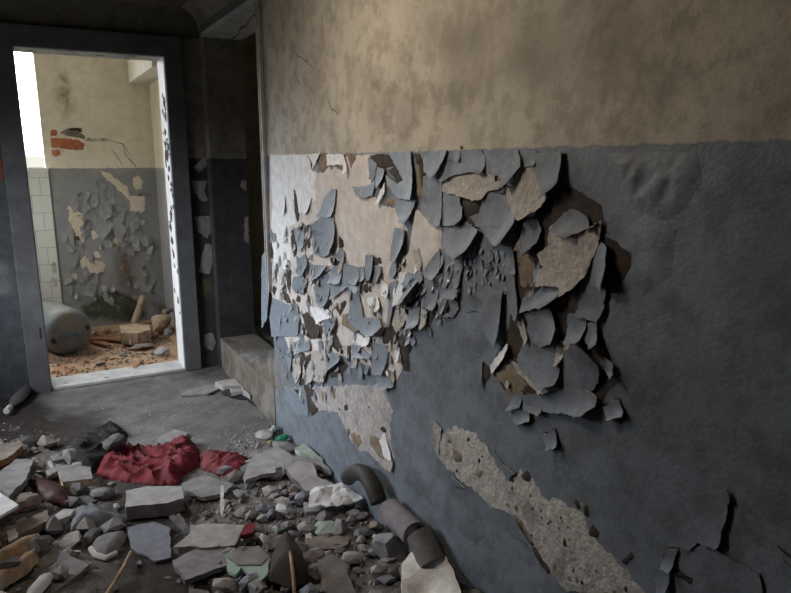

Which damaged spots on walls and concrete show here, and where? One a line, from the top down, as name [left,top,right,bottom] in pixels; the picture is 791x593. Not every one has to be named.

flaking render [49,128,85,158]
peeling [192,156,208,201]
peeling [58,170,156,305]
peeling [195,216,213,274]
peeling [261,144,631,472]
spalling [430,420,645,593]
peeling [654,489,791,593]